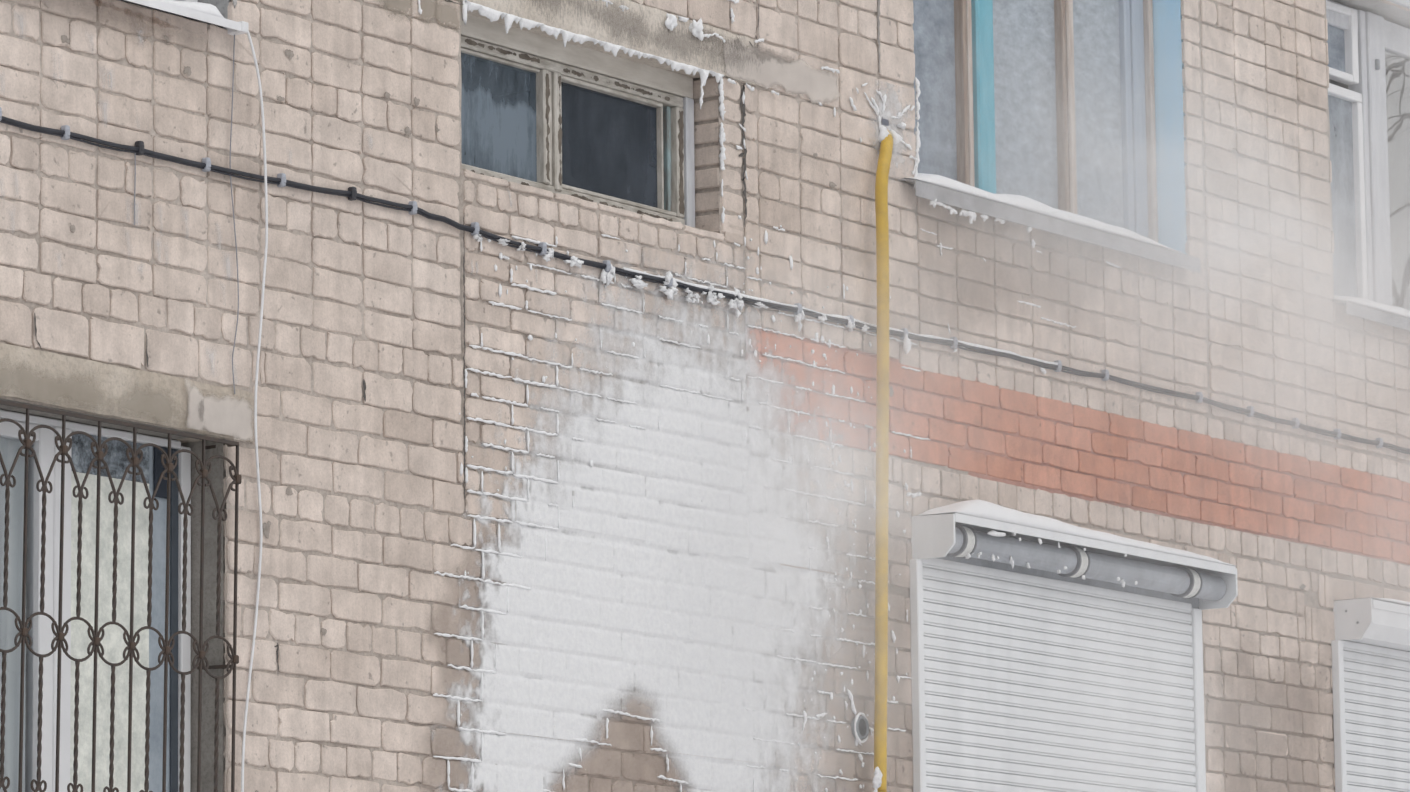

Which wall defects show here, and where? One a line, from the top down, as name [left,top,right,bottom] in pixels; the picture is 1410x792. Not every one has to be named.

crack [739,83,747,227]